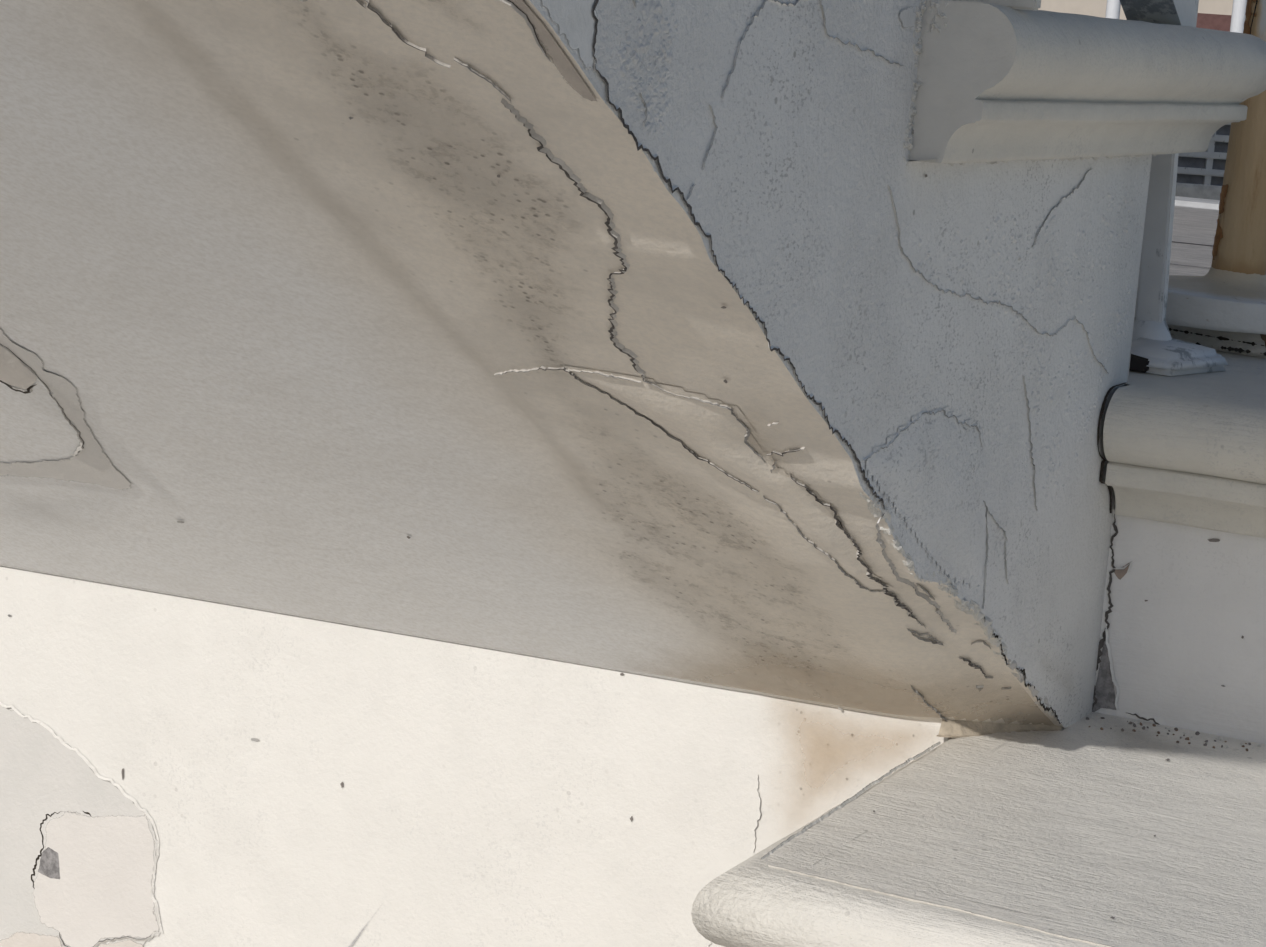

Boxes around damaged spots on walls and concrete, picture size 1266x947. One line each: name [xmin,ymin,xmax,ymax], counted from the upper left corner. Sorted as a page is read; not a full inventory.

corrosion [1243,0,1256,34]
crack [1031,168,1092,248]
corrosion [1212,184,1228,260]
peeling [0,329,131,490]
crack [356,0,1062,724]
crack [888,185,1126,710]
crack [1125,712,1177,728]
peeling [0,701,163,947]
crack [753,686,1114,947]